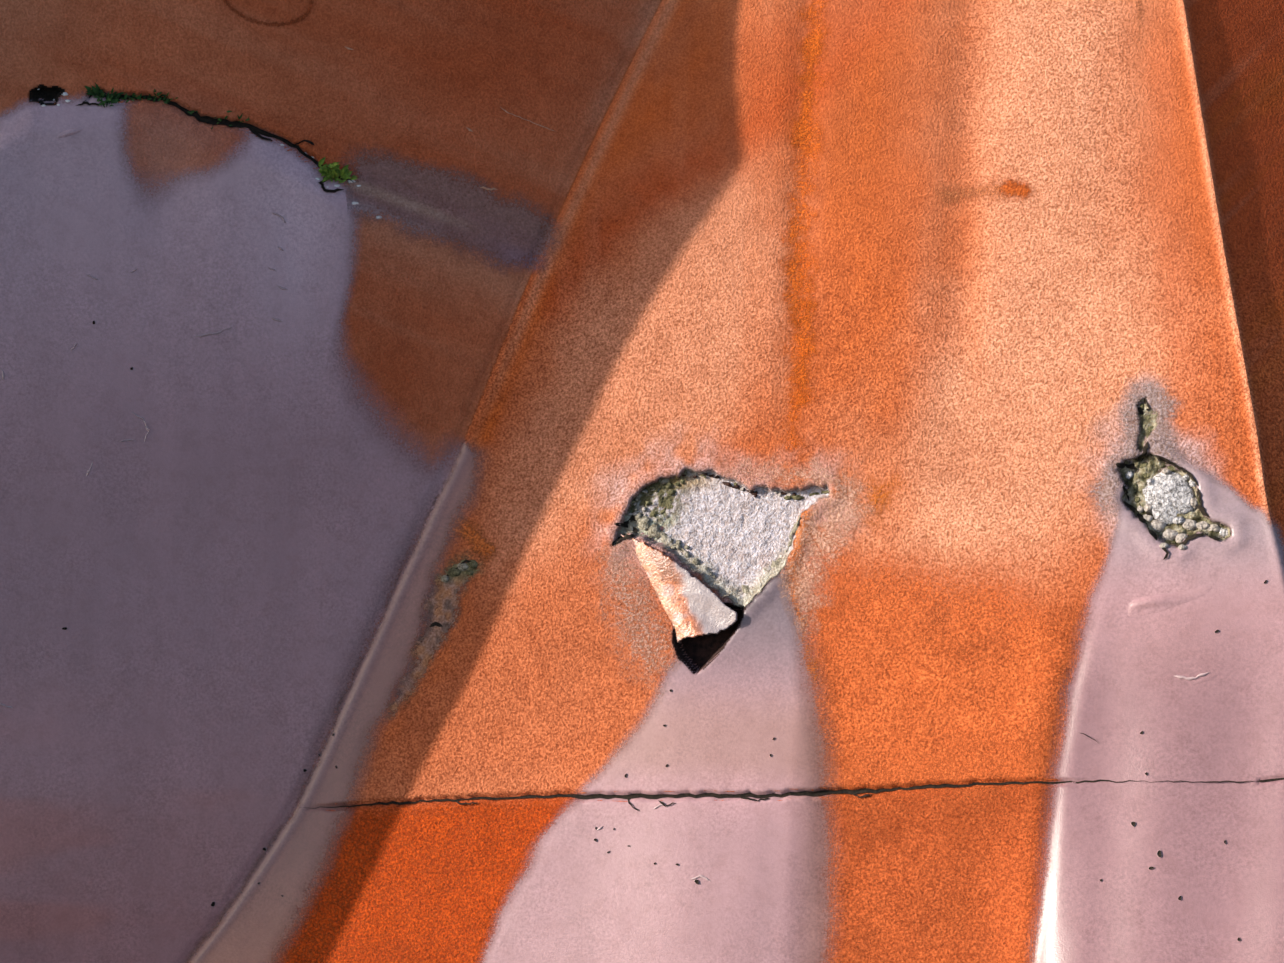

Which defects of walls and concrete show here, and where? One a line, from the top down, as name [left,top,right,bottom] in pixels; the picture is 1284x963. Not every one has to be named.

crack [75,94,382,219]
water stain [0,95,558,963]
spalling [612,469,830,674]
spalling [1115,398,1230,560]
crack [304,778,1284,811]